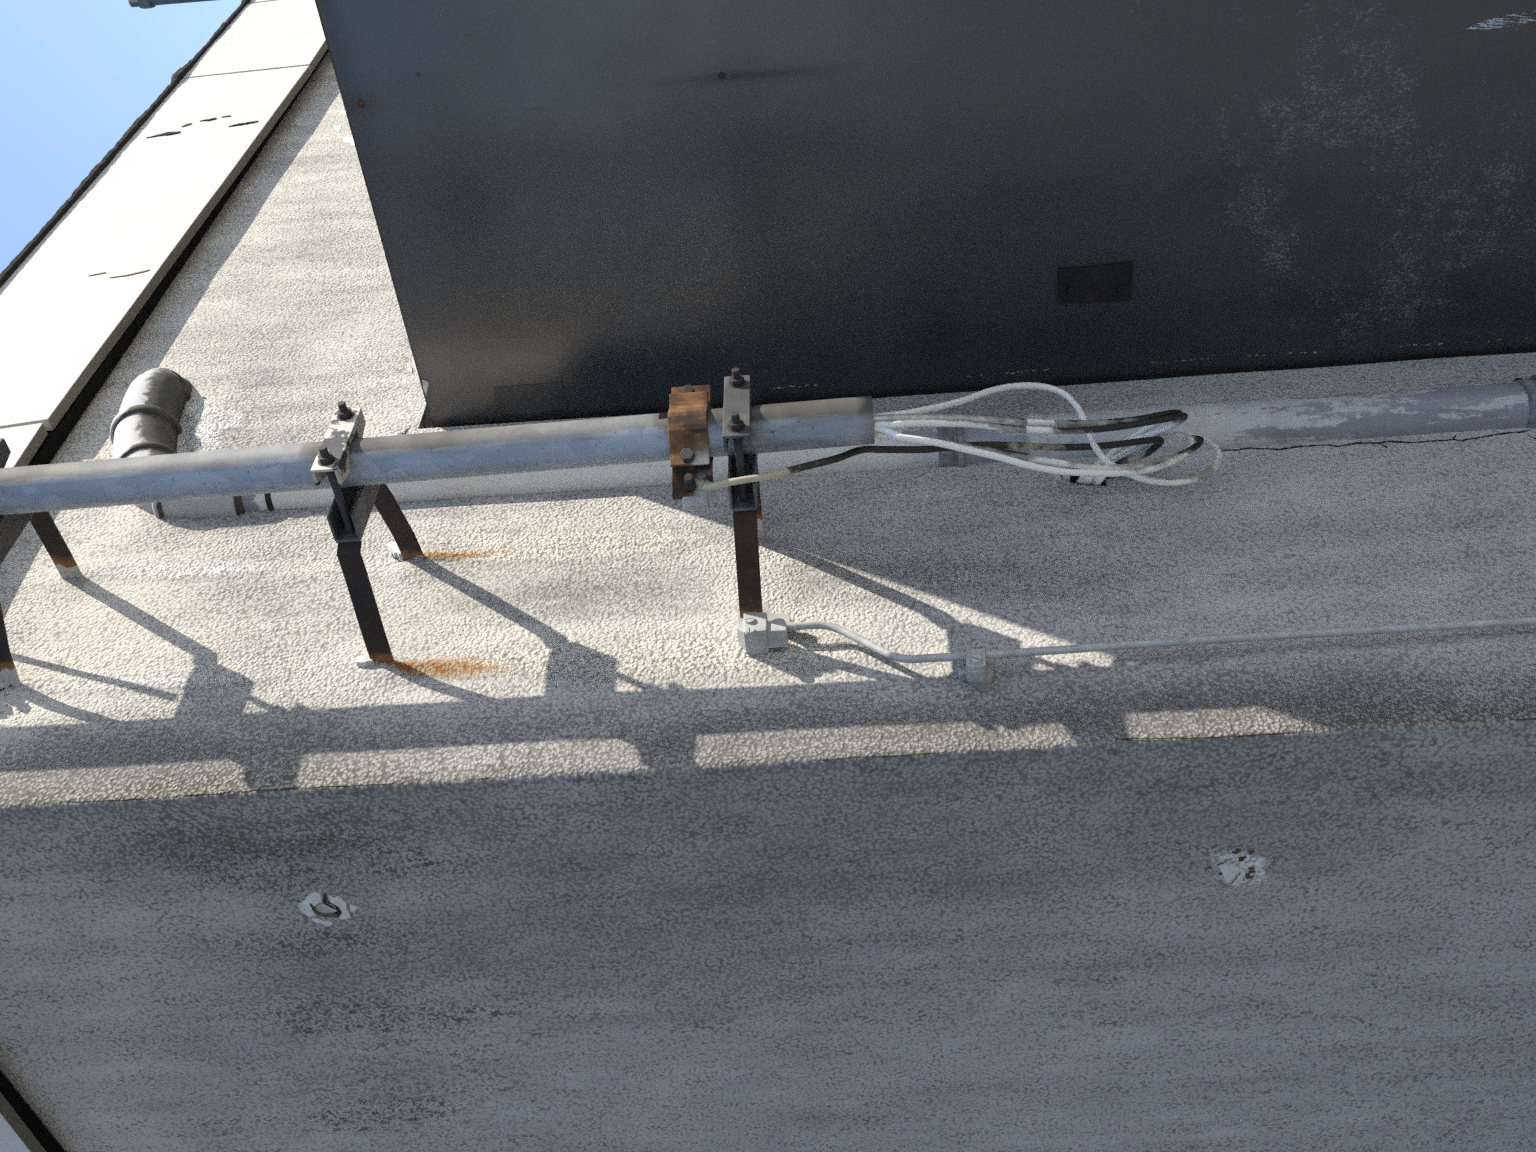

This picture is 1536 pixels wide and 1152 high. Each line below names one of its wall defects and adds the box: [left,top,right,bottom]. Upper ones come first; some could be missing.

corrosion [385,659,486,675]
spalling [1218,848,1256,884]
spalling [298,892,359,926]